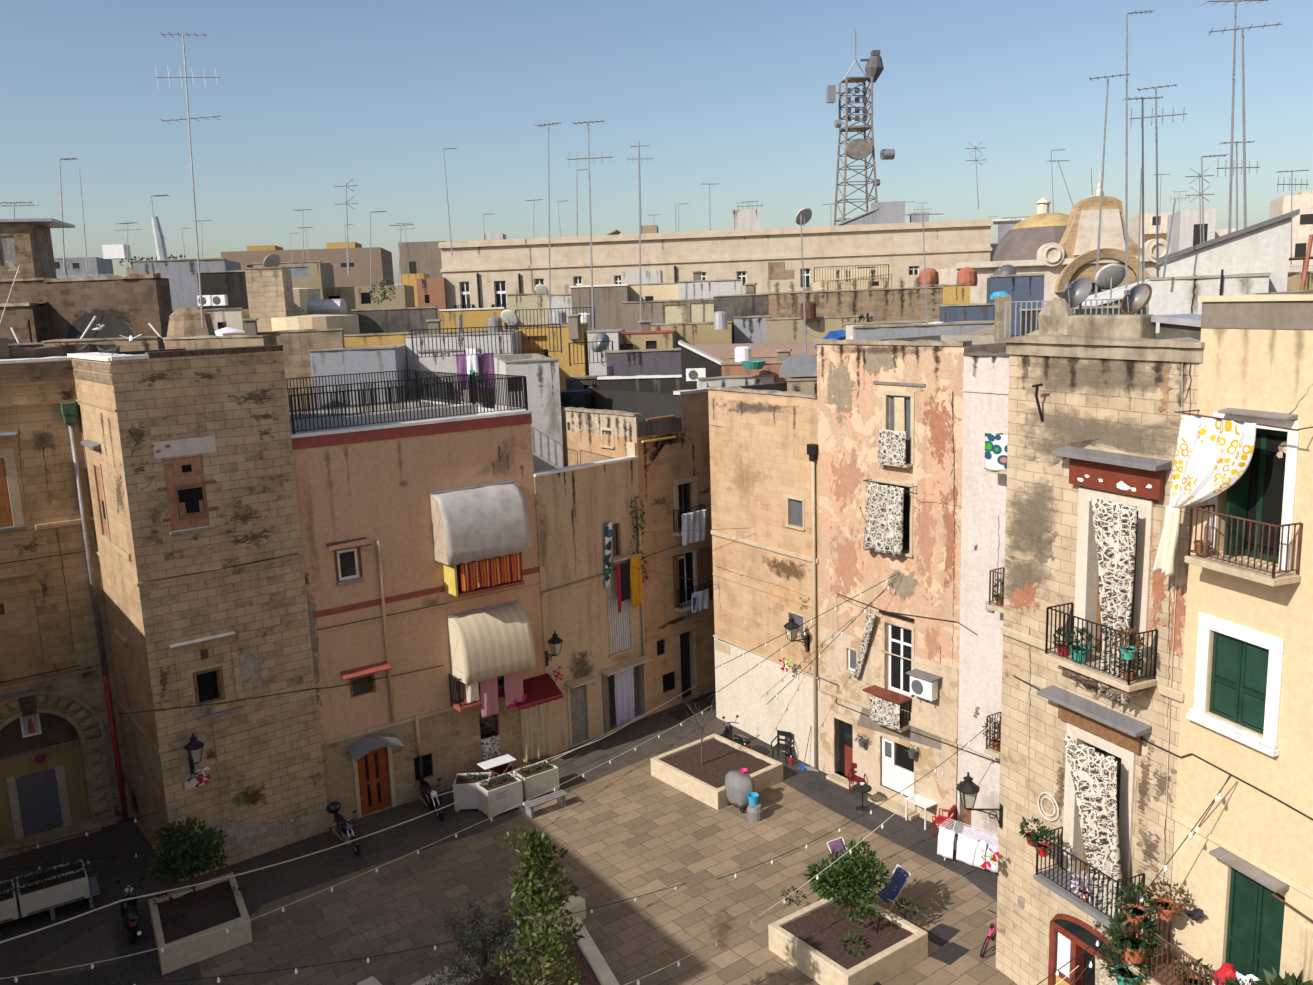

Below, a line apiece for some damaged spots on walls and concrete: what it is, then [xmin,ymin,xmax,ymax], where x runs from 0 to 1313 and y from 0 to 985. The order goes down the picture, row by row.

peeling [823,346,897,424]
damp [1031,412,1176,464]
damp [1022,347,1187,406]
peeling [829,439,867,611]
peeling [880,387,961,605]
peeling [920,620,944,660]
damp [1006,486,1053,597]
spalling [1147,535,1188,656]